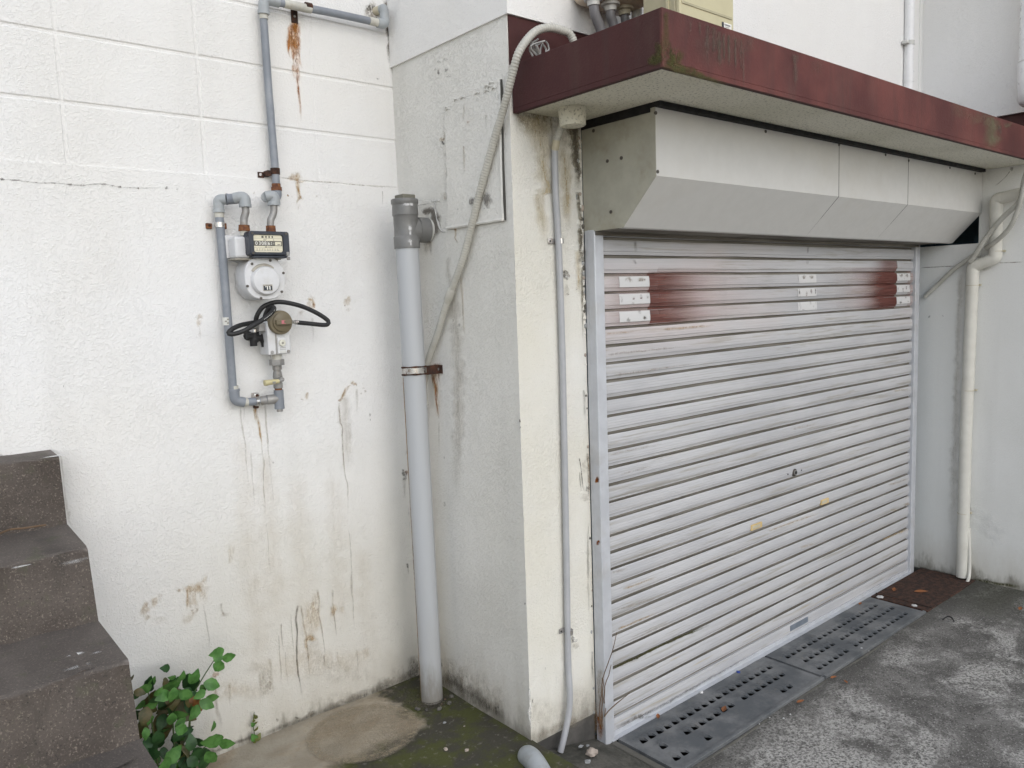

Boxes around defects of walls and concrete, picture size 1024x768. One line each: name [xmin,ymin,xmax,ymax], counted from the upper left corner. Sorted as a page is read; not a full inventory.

corrosion [287,23,300,94]